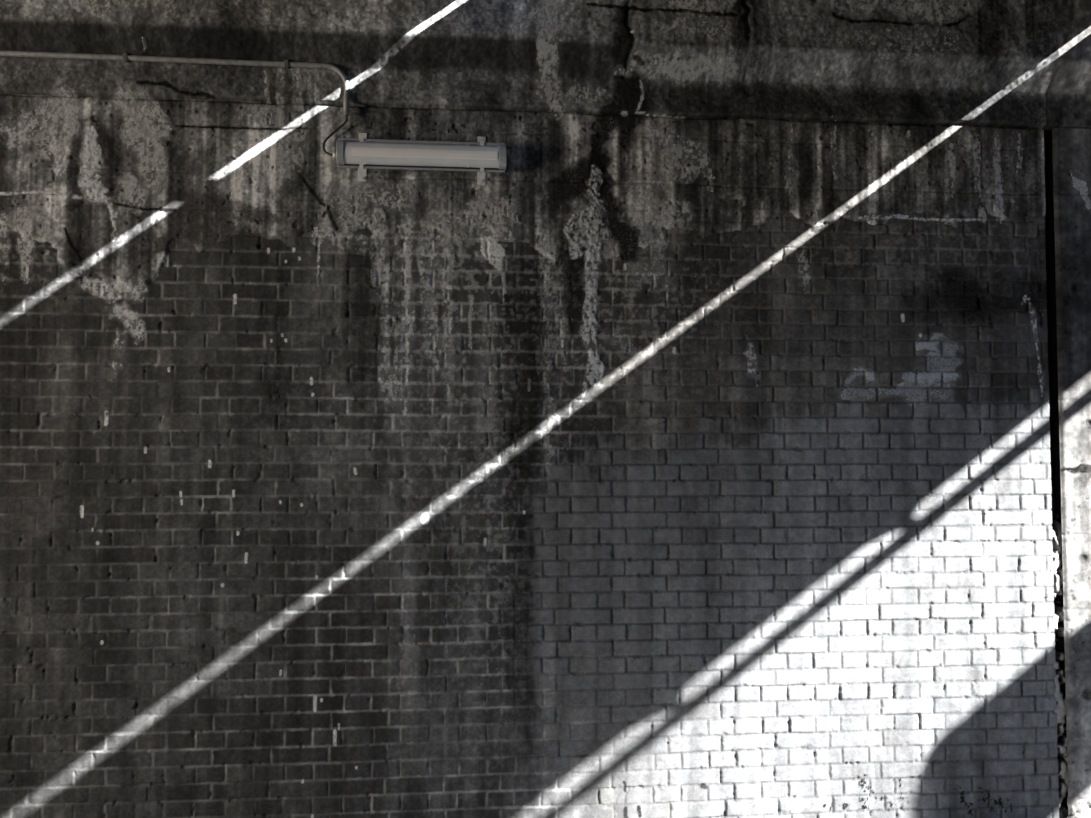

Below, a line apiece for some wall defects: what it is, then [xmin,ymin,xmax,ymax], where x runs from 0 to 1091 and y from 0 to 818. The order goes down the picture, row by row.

flaking render [60,116,122,187]
damp [858,134,1005,224]
damp [312,0,715,471]
damp [797,247,811,294]
damp [745,344,759,386]